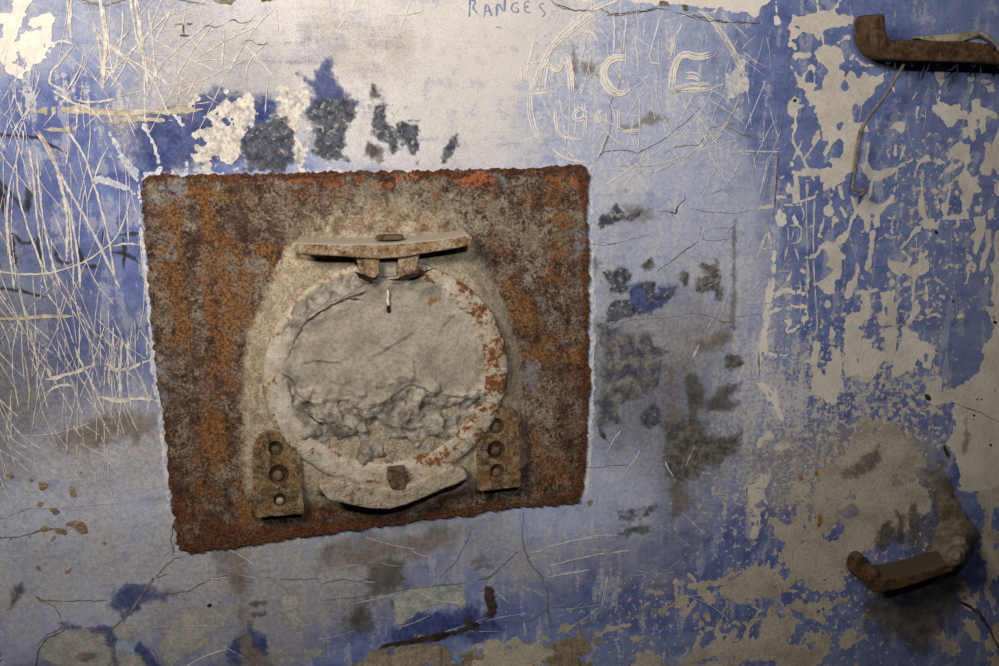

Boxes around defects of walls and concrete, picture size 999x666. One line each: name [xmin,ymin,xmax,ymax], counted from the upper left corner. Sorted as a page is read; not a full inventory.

crack [551,0,759,24]
peeling [158,410,171,510]
spalling [291,386,486,468]
peeling [587,167,597,370]
leakage [598,204,640,228]
leakage [595,260,728,440]
leakage [640,374,742,481]
crack [595,21,789,271]
leakage [724,355,744,368]
peeling [630,0,999,666]
crack [11,520,230,666]
peeling [350,416,932,666]